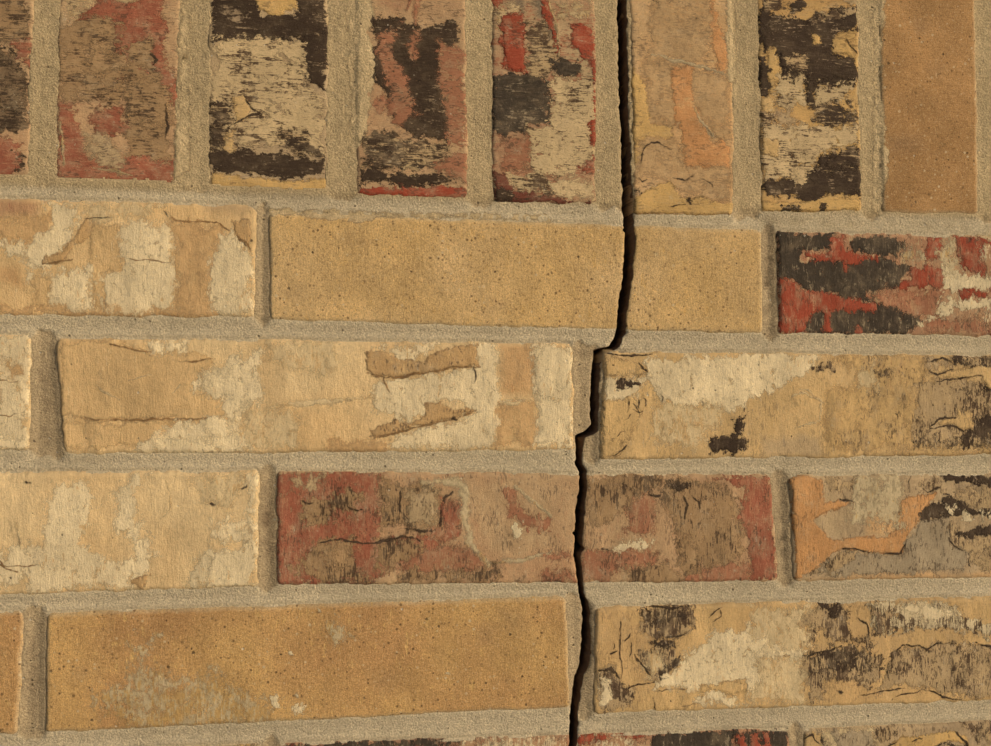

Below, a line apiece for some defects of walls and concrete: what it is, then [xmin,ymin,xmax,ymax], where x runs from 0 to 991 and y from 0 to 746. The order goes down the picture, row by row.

crack [568,0,636,746]